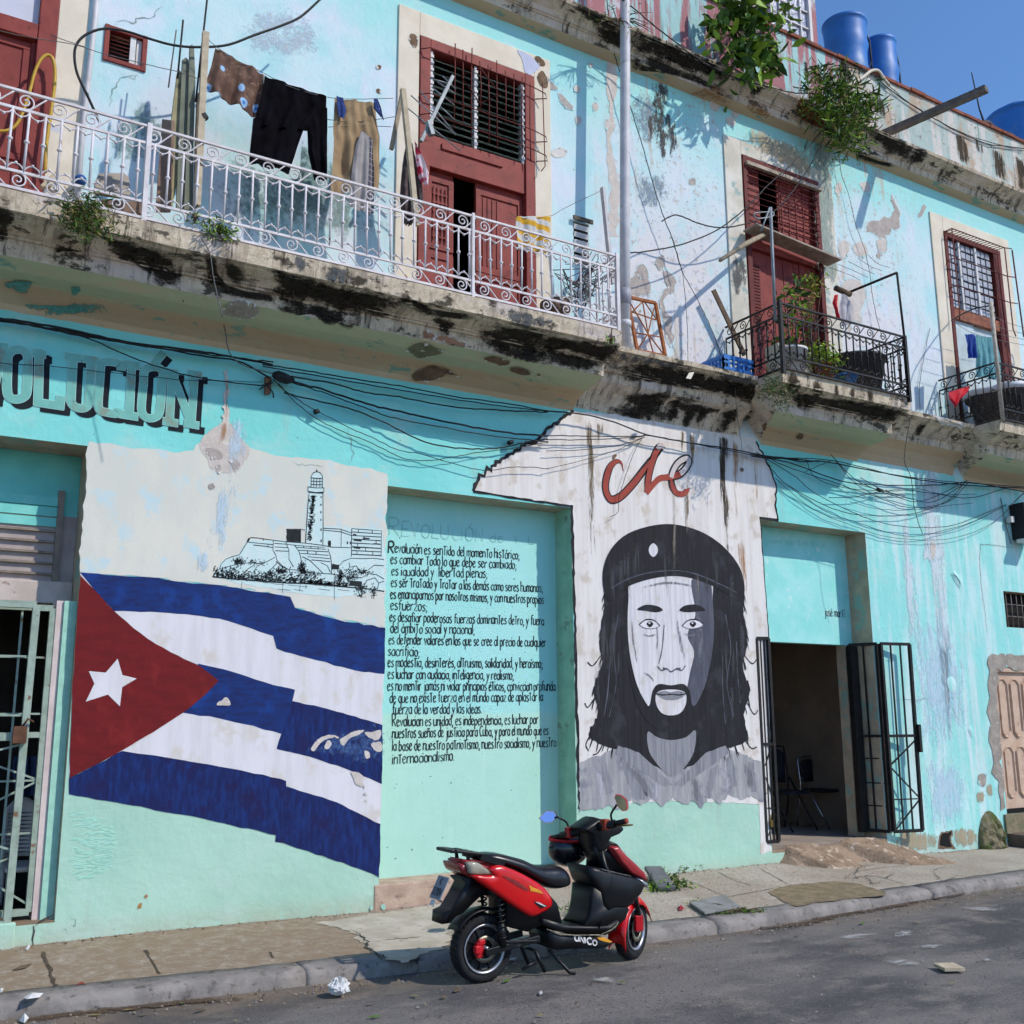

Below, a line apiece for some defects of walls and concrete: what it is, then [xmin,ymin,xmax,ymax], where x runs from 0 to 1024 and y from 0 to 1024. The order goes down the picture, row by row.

damp [573,2,732,157]
damp [855,128,928,167]
damp [956,135,1024,190]
peeling [838,192,902,261]
damp [204,250,472,335]
peeling [630,254,677,347]
peeling [840,276,867,324]
peeling [199,370,250,489]
damp [481,308,758,550]
damp [785,374,926,436]
peeling [311,730,383,759]
spalling [351,772,367,802]